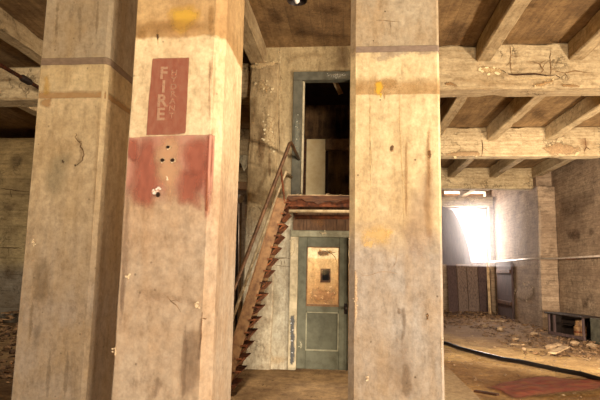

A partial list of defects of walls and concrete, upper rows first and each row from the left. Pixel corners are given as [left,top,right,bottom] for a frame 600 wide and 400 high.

crack [501,47,588,78]
peeling [126,135,215,209]